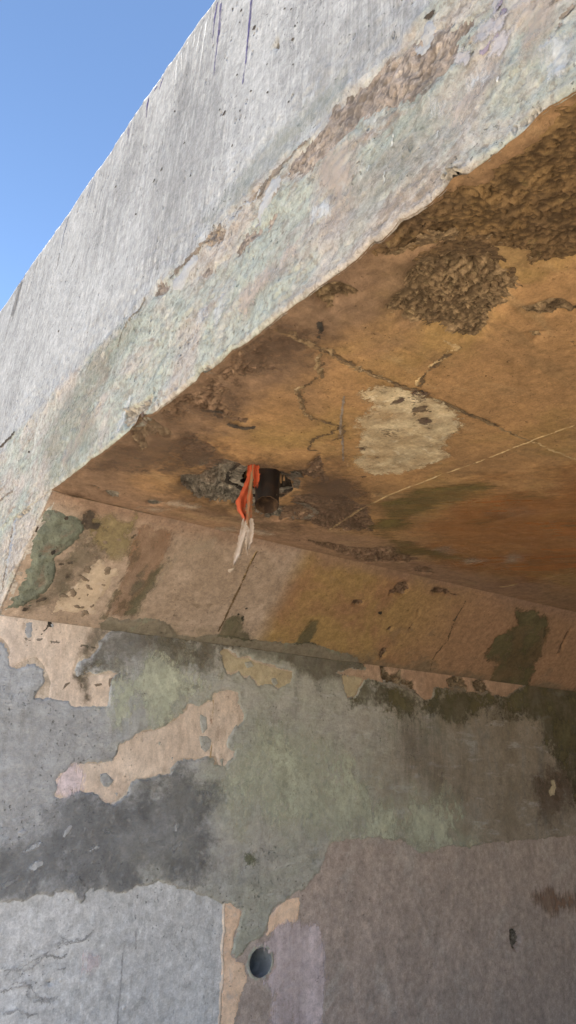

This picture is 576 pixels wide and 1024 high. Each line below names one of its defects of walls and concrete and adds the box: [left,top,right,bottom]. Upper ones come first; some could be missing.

spalling [371,103,576,287]
crack [273,328,576,461]
spalling [180,459,319,520]
damp [303,386,497,562]
peeling [0,559,119,707]
peeling [220,649,292,688]
peeling [54,690,244,803]
damp [0,772,217,896]
peeling [218,903,247,1024]
peeling [263,898,326,1024]